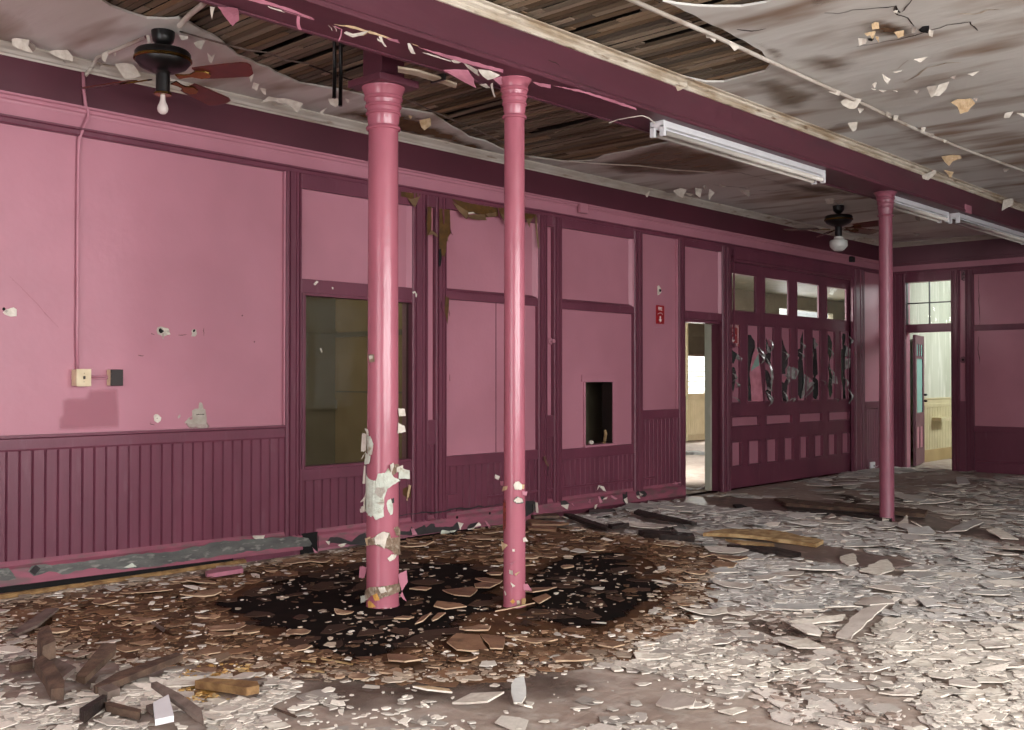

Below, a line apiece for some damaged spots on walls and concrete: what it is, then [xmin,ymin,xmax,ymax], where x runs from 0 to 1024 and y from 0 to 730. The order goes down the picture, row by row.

peeling [210,7,239,26]
peeling [249,0,314,30]
peeling [328,24,503,98]
crack [834,0,998,83]
peeling [533,82,636,110]
peeling [829,89,870,131]
peeling [398,408,406,434]
peeling [360,429,411,520]
peeling [488,474,538,517]
peeling [28,533,366,576]
water stain [69,525,718,671]
water stain [24,606,77,639]